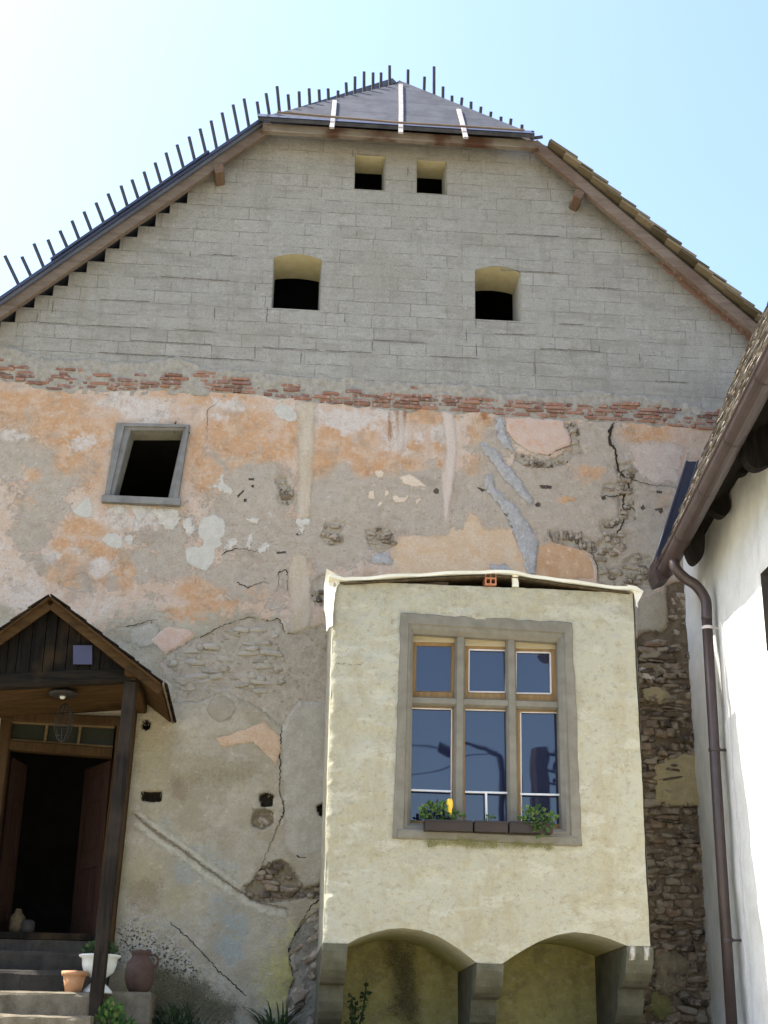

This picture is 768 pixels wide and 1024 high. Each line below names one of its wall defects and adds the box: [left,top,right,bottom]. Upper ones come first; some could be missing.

spalling [276,478,294,506]
peeling [365,440,685,589]
peeling [505,418,584,468]
crack [605,423,665,534]
spalling [152,617,328,764]
crack [250,726,285,884]
spalling [636,581,712,1024]
crack [170,922,246,996]
spalling [240,859,320,1024]